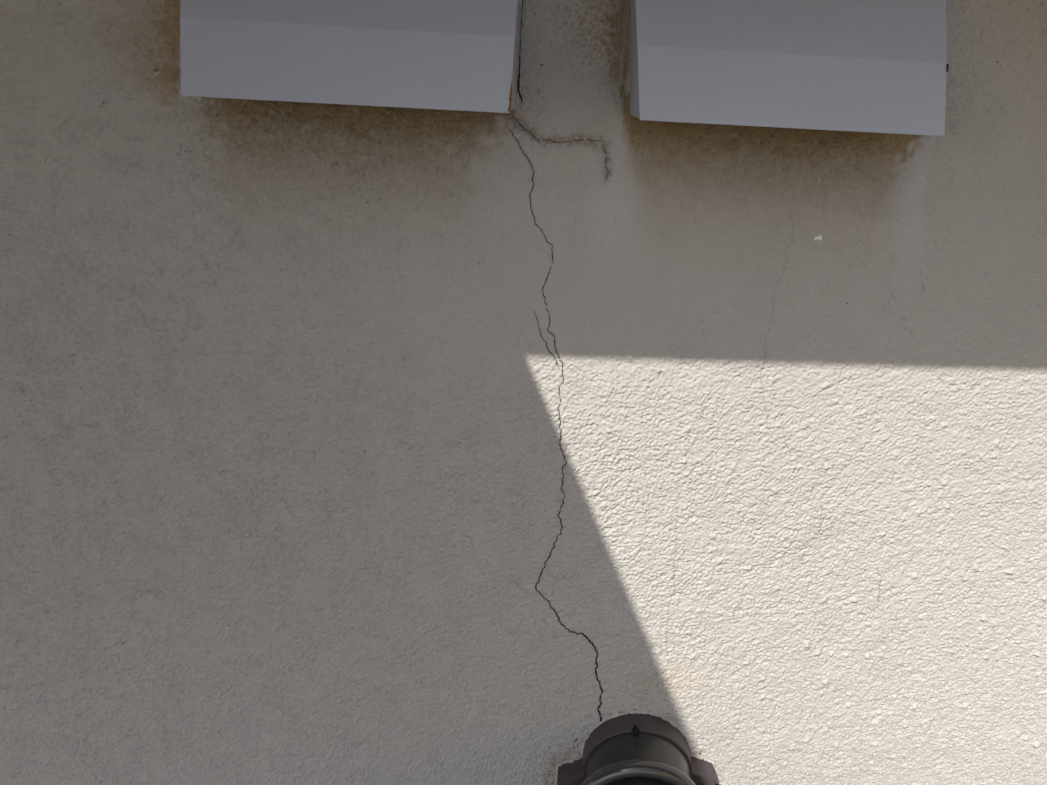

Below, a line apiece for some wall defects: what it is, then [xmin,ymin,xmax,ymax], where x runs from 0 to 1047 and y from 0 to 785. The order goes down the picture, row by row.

crack [497,0,609,722]